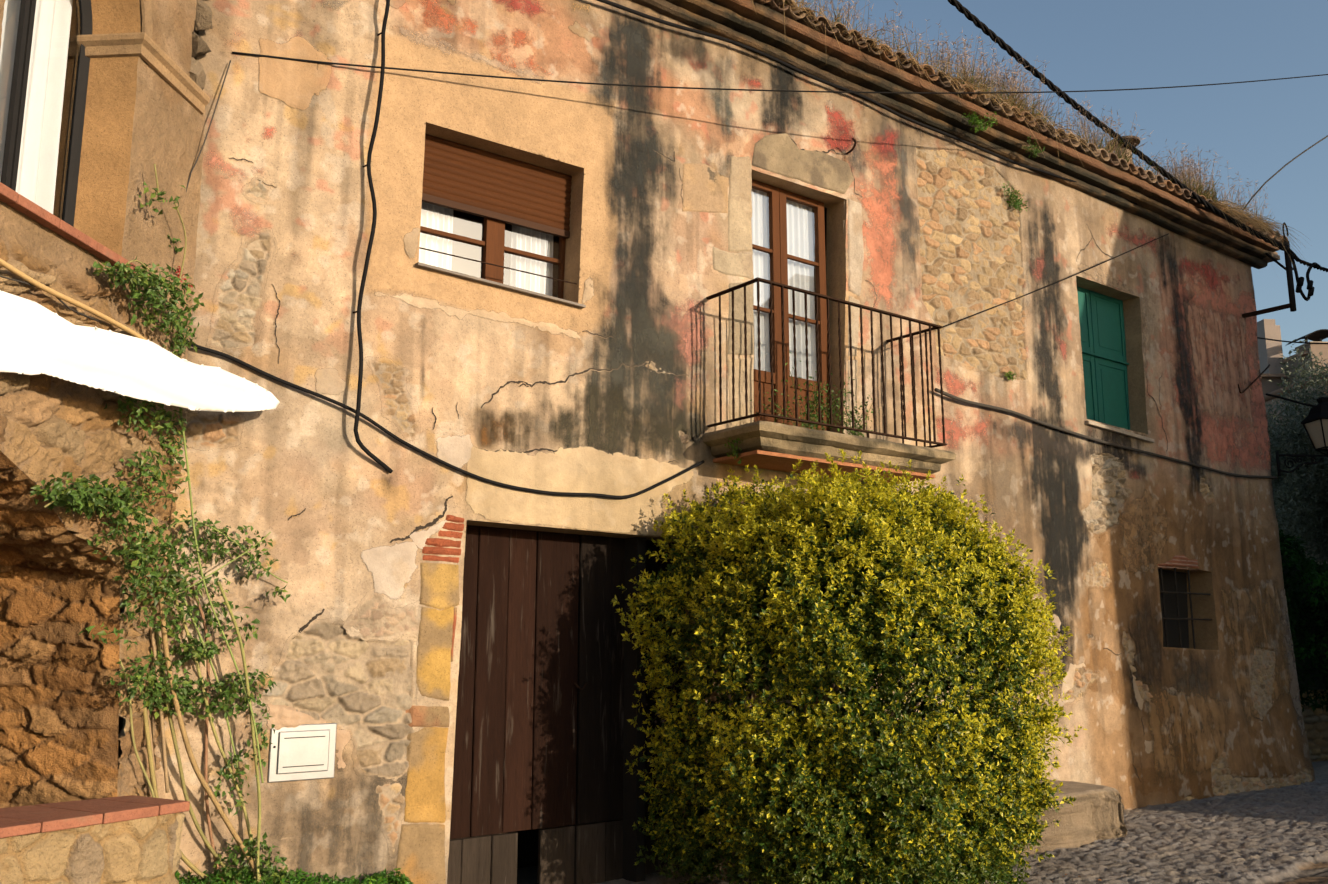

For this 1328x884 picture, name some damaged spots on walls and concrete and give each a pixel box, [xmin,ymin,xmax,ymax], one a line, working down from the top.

spalling [207,152,278,357]
damp [549,18,733,459]
peeling [662,301,707,363]
spalling [364,356,421,441]
damp [479,416,514,444]
spalling [678,426,692,448]
peeling [436,434,694,536]
spalling [1081,449,1140,538]
spalling [1082,557,1113,591]
spalling [248,520,447,858]
spalling [1246,589,1305,736]
spalling [1210,747,1314,797]